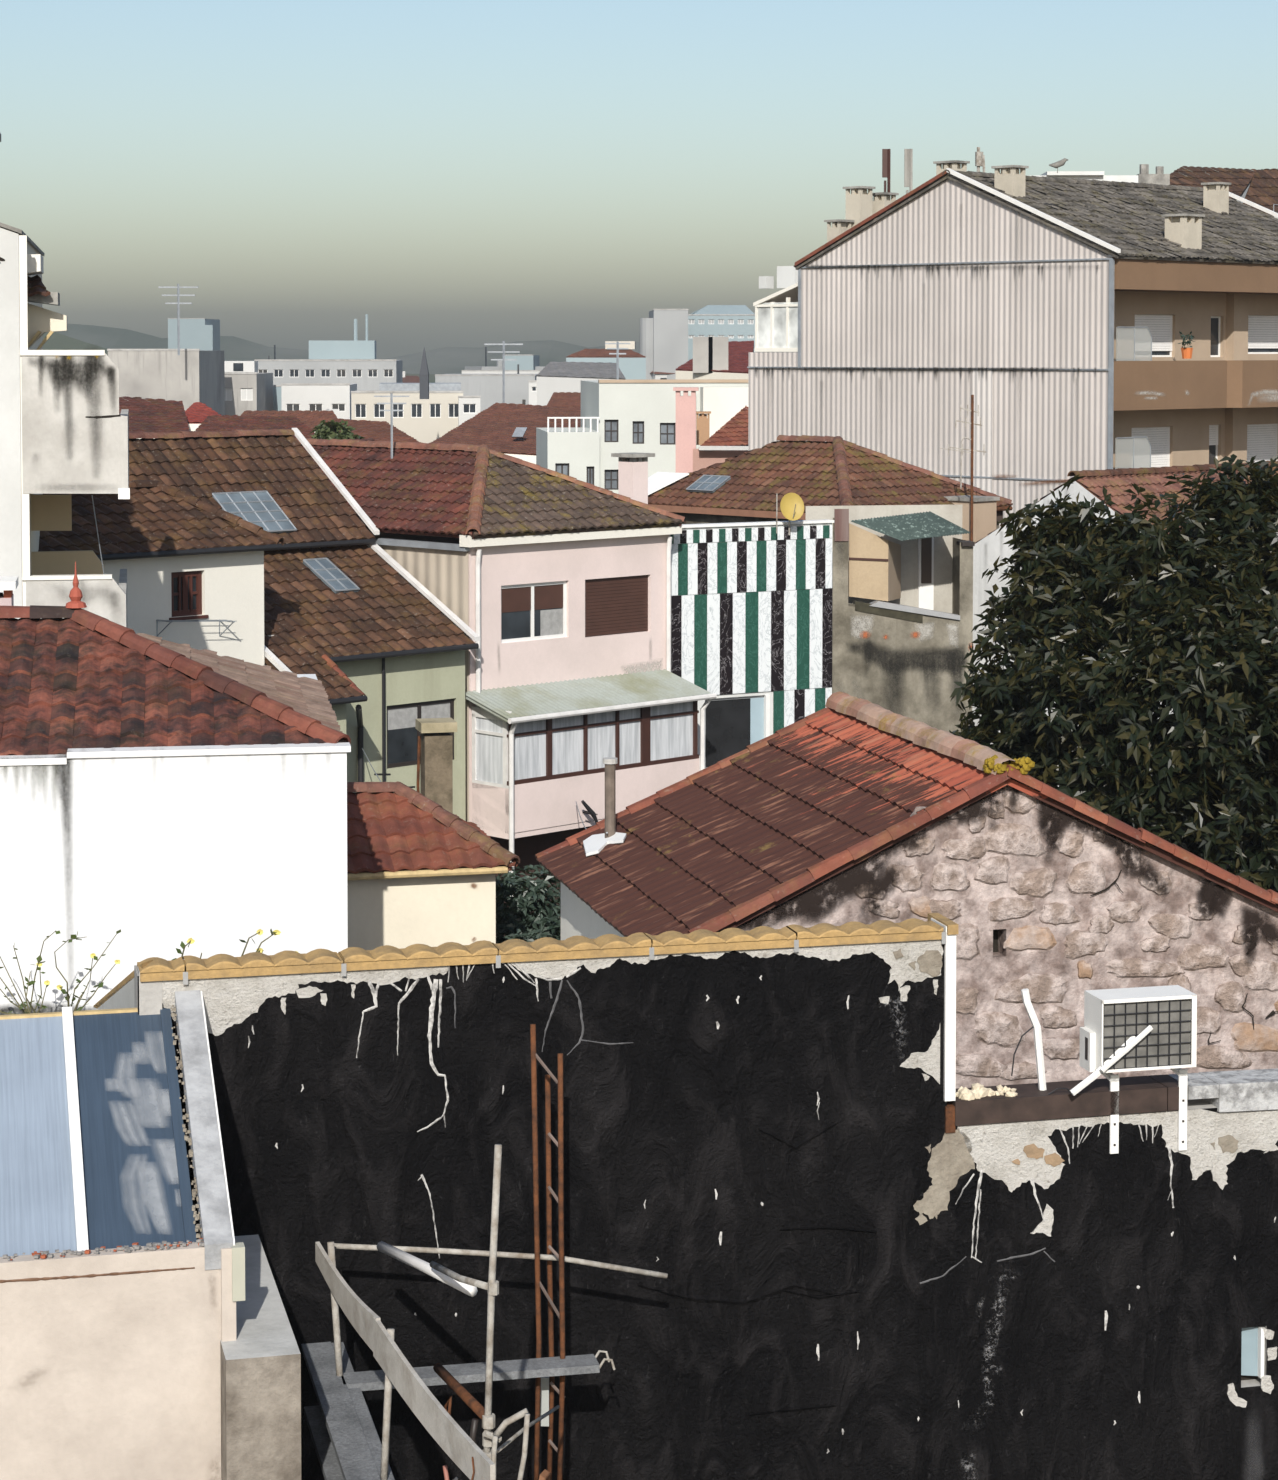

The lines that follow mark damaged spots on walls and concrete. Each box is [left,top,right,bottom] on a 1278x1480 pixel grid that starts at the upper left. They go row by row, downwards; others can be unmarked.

water stain [40,355,114,397]
water stain [1198,876,1278,959]
peeling [502,939,944,1004]
peeling [162,966,448,1048]
peeling [900,1026,940,1084]
peeling [913,1109,1278,1237]
crack [920,1248,1055,1284]
spalling [1261,1327,1277,1394]
spalling [1227,1383,1247,1408]